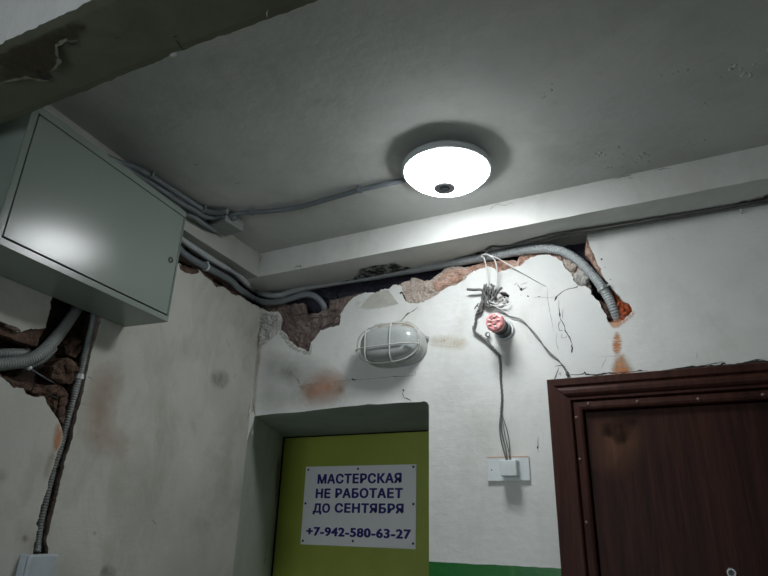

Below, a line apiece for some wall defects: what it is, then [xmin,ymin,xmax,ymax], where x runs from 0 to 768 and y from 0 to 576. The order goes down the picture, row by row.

peeling [0,25,84,83]
spalling [0,297,71,351]
spalling [0,310,87,424]
flaking render [260,239,611,355]
crack [534,286,578,353]
corrosion [613,335,628,372]